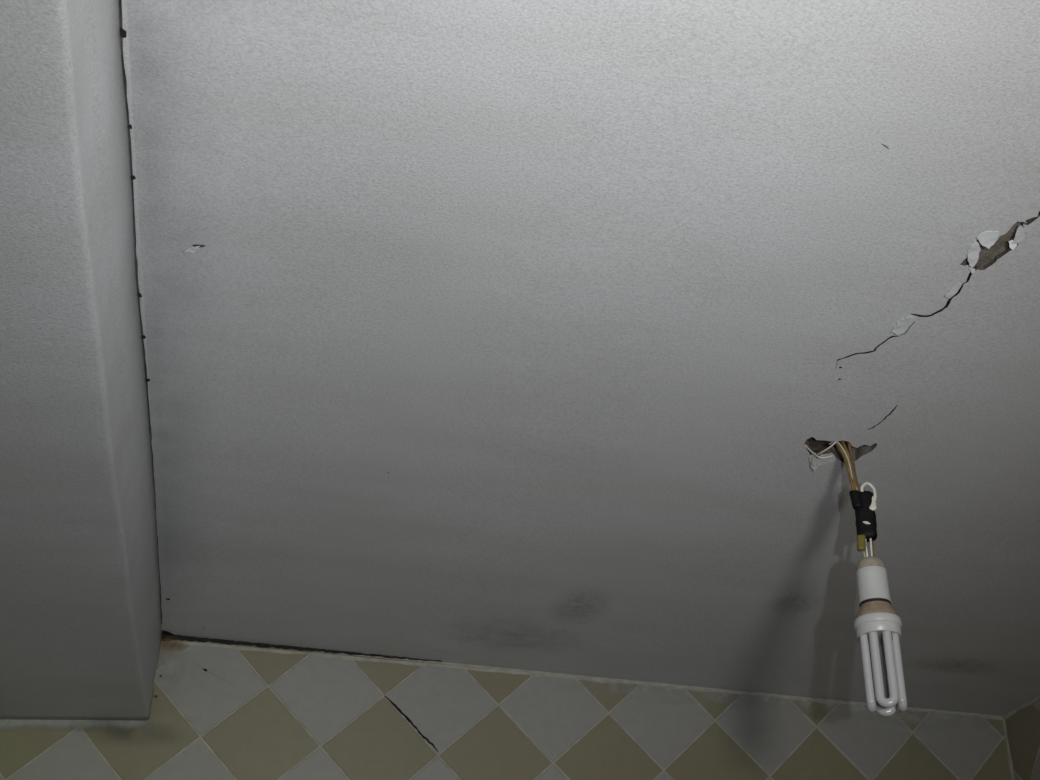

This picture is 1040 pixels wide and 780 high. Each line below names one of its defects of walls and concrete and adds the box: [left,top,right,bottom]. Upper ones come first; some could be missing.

crack [1022,211,1040,225]
spalling [960,221,1026,273]
crack [836,272,972,380]
crack [385,696,438,752]